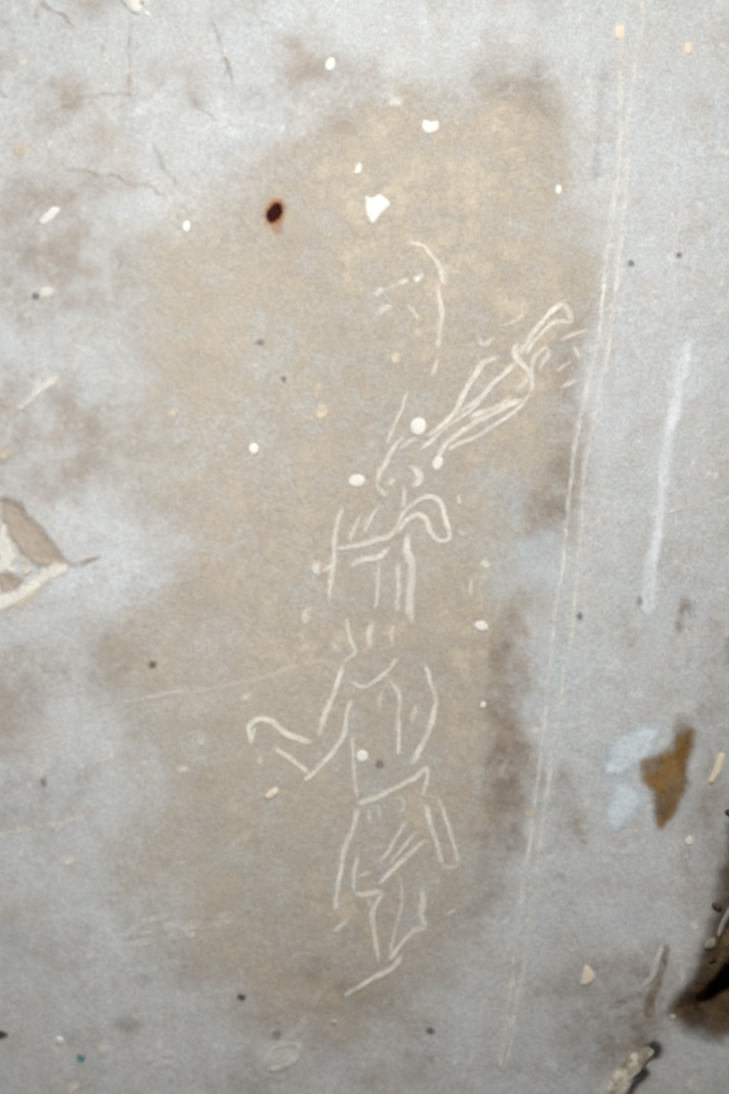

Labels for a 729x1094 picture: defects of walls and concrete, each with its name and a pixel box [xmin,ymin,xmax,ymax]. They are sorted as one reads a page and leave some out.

flaking render [0,500,68,610]
flaking render [604,1042,661,1094]